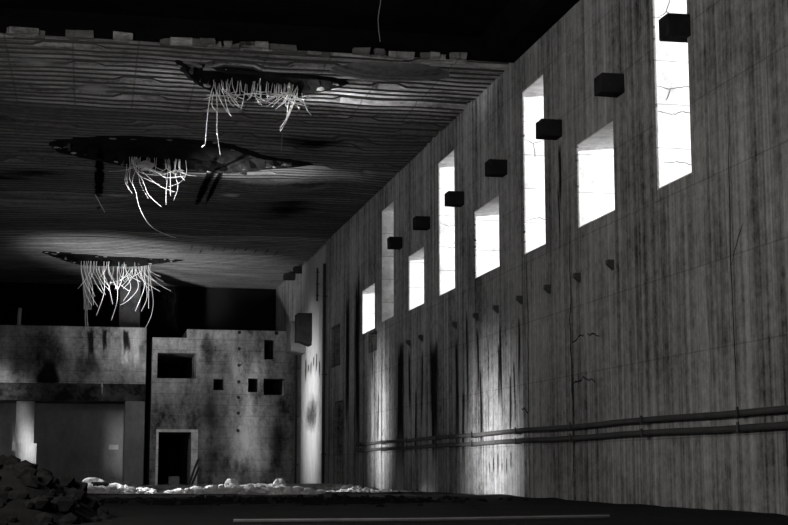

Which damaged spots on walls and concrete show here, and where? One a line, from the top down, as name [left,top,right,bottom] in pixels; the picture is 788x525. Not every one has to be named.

spalling [49,60,349,238]
spalling [42,251,183,325]
water stain [85,330,107,370]
water stain [123,330,138,355]